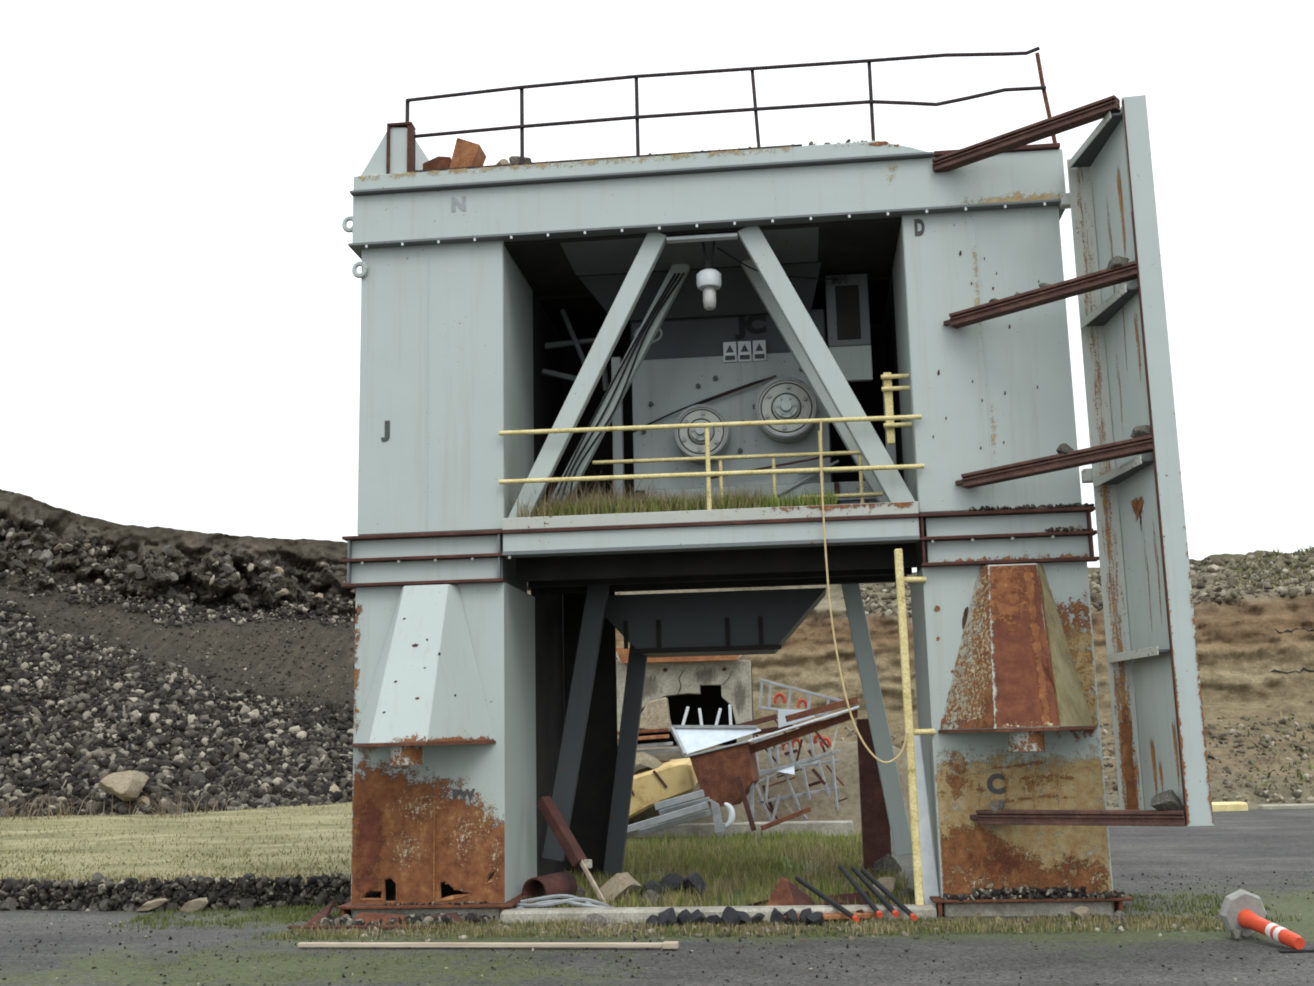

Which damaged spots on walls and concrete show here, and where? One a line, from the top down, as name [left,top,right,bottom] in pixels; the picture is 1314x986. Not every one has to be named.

rust [1084,293,1147,444]
rust [351,604,505,904]
rust [936,552,1113,896]
rust [1100,461,1190,824]
rust [1186,543,1214,824]